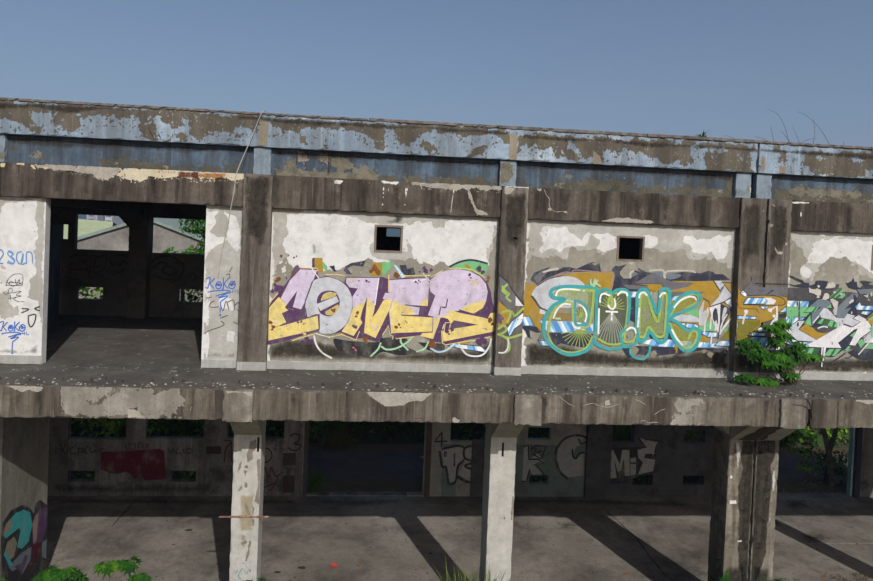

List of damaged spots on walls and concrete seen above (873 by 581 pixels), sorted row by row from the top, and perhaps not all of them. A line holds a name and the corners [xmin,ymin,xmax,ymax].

rust [159,171,225,180]
crack [451,188,488,215]
peeling [0,100,873,373]
peeling [60,386,192,419]
spalling [367,391,432,407]
spalling [670,397,704,426]